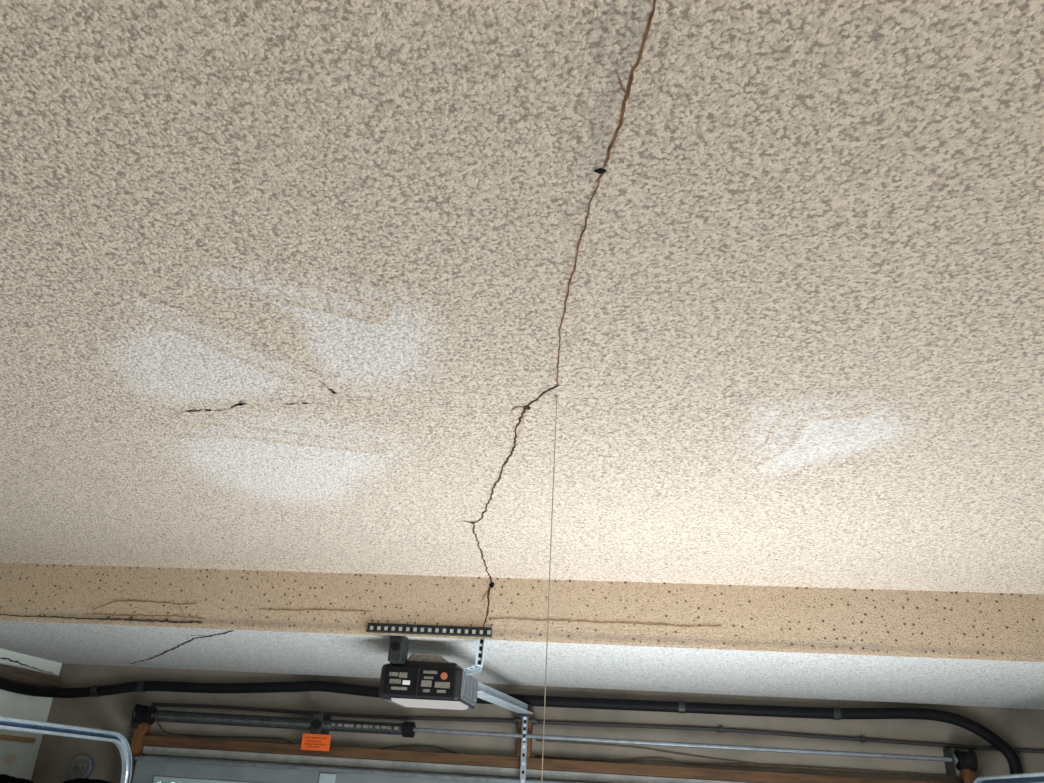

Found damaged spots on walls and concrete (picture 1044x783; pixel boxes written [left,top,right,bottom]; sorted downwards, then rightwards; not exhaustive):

damp [77,248,468,514]
crack [461,0,721,627]